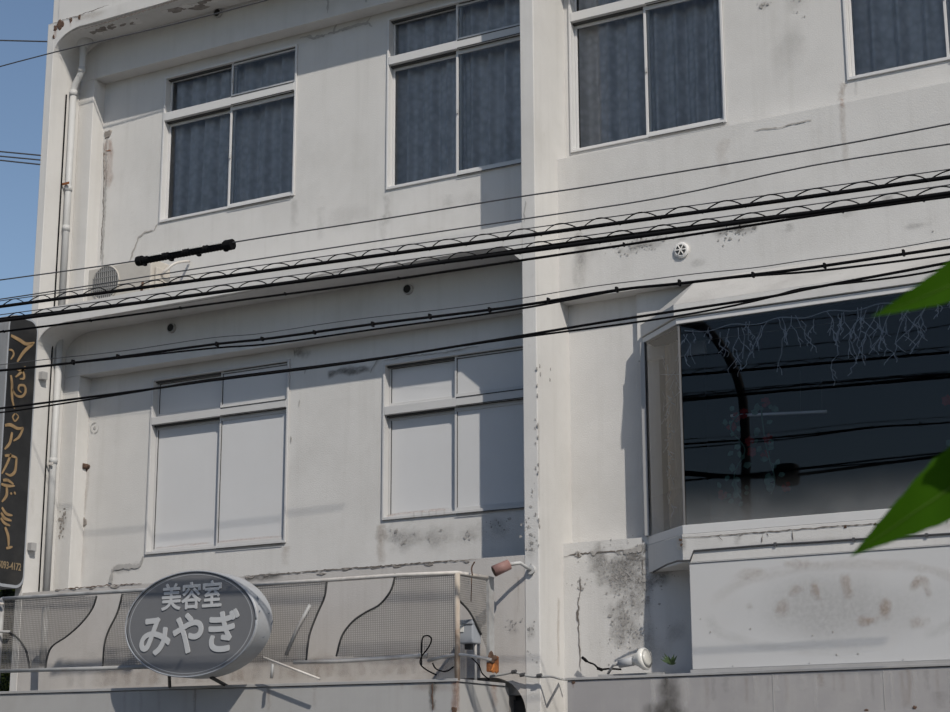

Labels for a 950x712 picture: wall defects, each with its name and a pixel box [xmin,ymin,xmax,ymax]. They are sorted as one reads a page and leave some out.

crack [300,0,372,39]
crack [130,225,157,260]
crack [576,553,584,669]
damp [566,534,679,665]